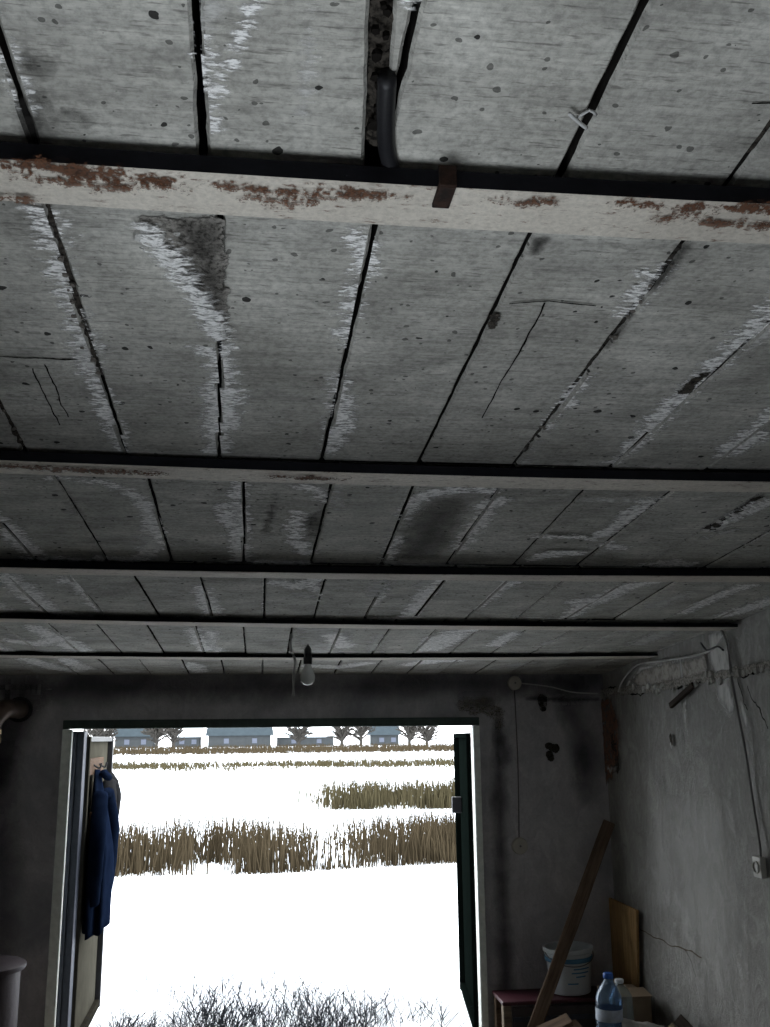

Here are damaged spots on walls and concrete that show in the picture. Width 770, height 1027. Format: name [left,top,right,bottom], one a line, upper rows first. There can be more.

damp [188,0,262,134]
rust [0,193,39,205]
rust [0,154,191,196]
rust [208,180,411,211]
rust [488,196,558,209]
rust [606,198,770,232]
crack [482,300,596,418]
damp [601,290,770,465]
damp [378,487,512,568]
damp [363,580,447,621]
damp [298,628,383,669]
damp [397,630,481,666]